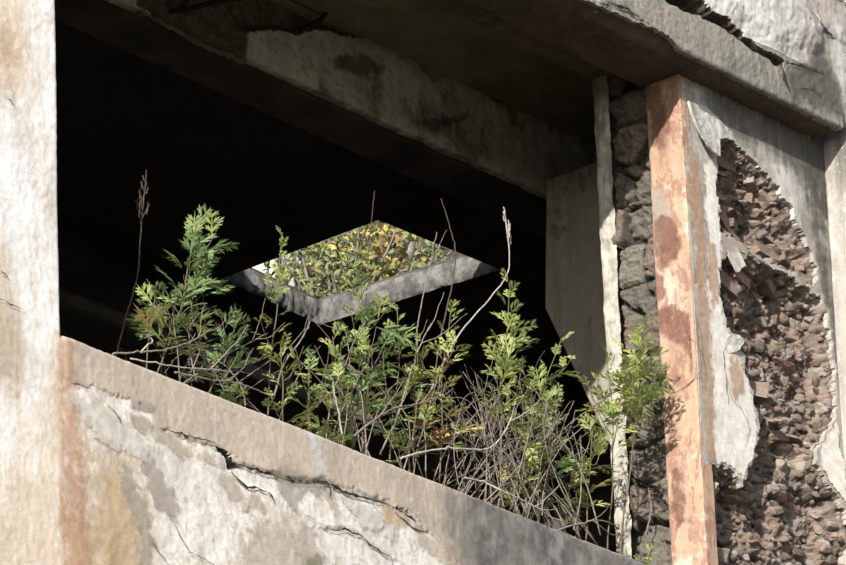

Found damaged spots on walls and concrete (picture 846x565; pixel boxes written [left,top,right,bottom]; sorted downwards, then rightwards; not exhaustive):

crack [594,4,640,18]
rust [689,154,719,461]
rust [730,356,744,399]
spalling [701,140,846,565]
peeling [69,390,180,565]
crack [162,428,416,522]
crack [302,513,393,565]